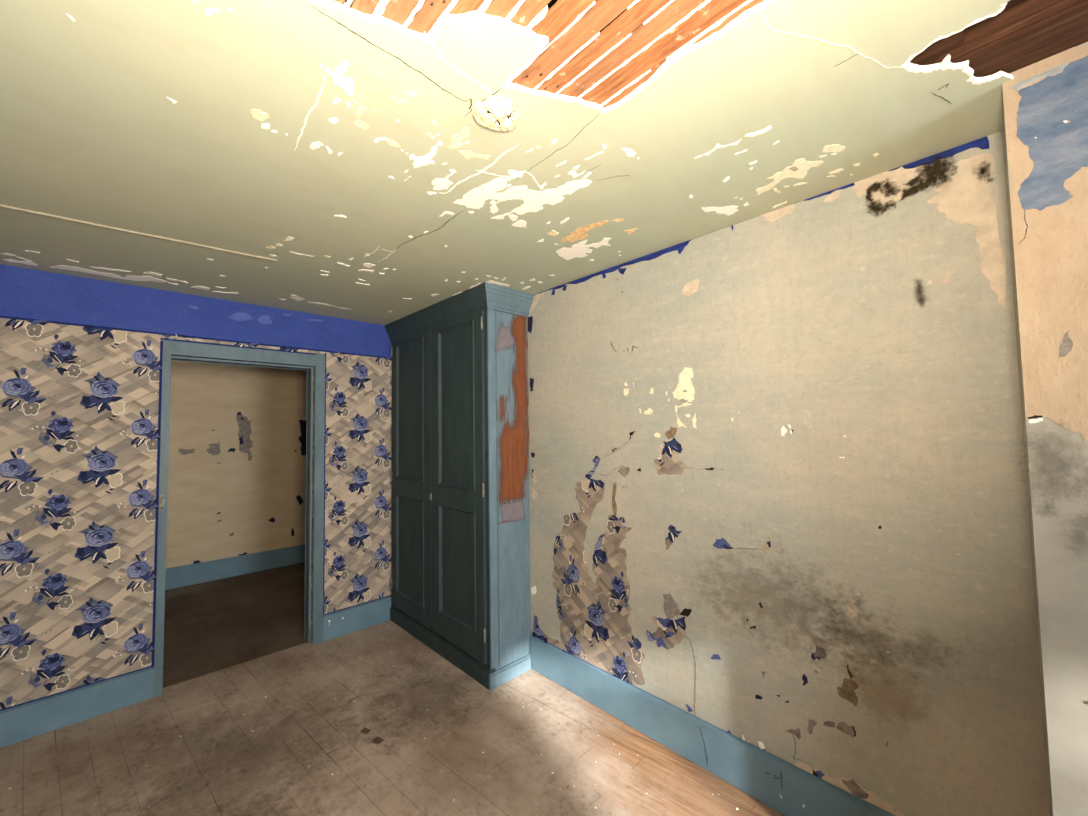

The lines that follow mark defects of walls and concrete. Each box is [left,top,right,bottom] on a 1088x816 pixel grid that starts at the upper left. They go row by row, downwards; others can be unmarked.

crack [313,6,502,116]
spalling [307,0,775,114]
crack [295,82,326,149]
peeling [319,60,490,195]
peeling [2,251,238,294]
peeling [265,236,396,286]
crack [369,116,597,262]
spalling [444,272,554,334]
peeling [439,144,607,228]
peeling [537,218,638,261]
spalling [694,3,1088,444]
water stain [866,156,956,215]